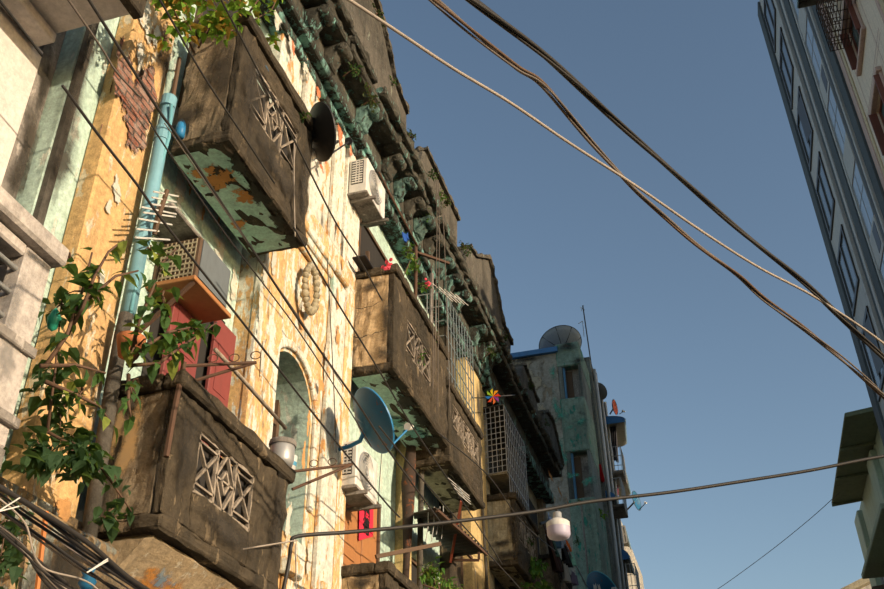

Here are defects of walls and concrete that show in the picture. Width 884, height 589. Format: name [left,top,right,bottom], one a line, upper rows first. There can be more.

spalling [110,1,162,154]
peeling [175,164,254,226]
peeling [230,267,239,301]
peeling [257,251,277,380]
peeling [298,274,323,339]
peeling [319,325,339,394]
peeling [301,410,311,469]
peeling [141,568,182,589]